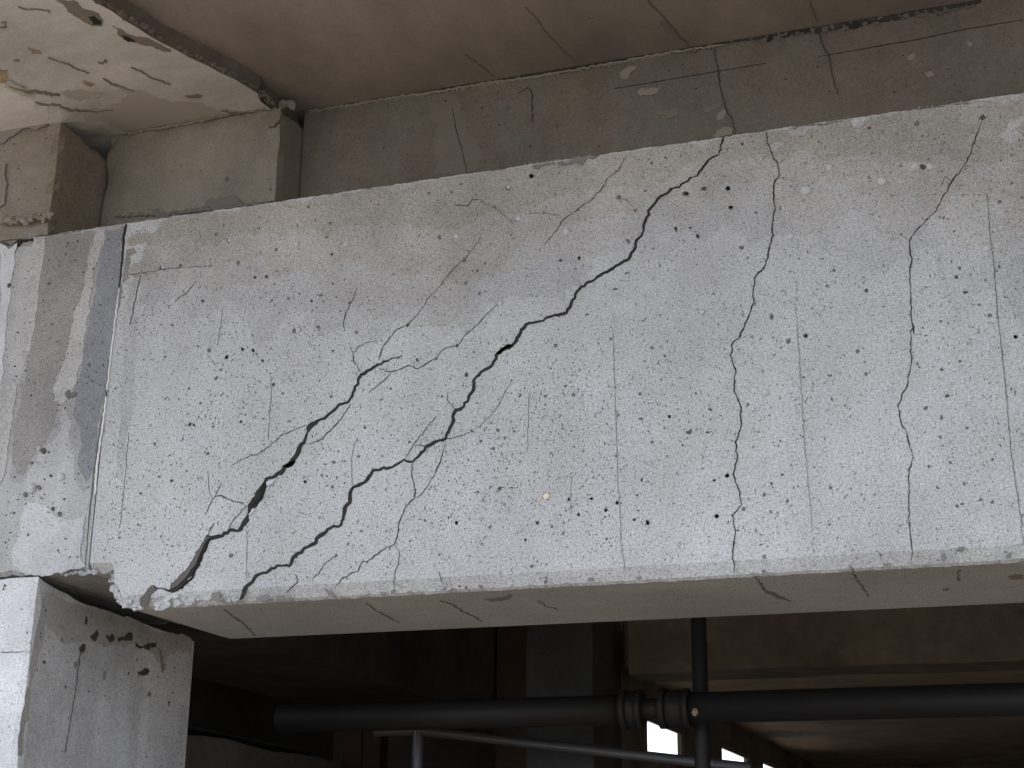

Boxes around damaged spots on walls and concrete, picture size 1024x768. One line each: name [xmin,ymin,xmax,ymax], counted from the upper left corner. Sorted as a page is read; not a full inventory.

spalling [56,0,296,128]
crack [85,364,109,565]
crack [113,224,213,328]
spalling [170,537,211,589]
spalling [196,591,239,604]
crack [151,48,736,636]
water stain [8,94,1024,492]
crack [730,133,792,602]
crack [897,118,983,561]